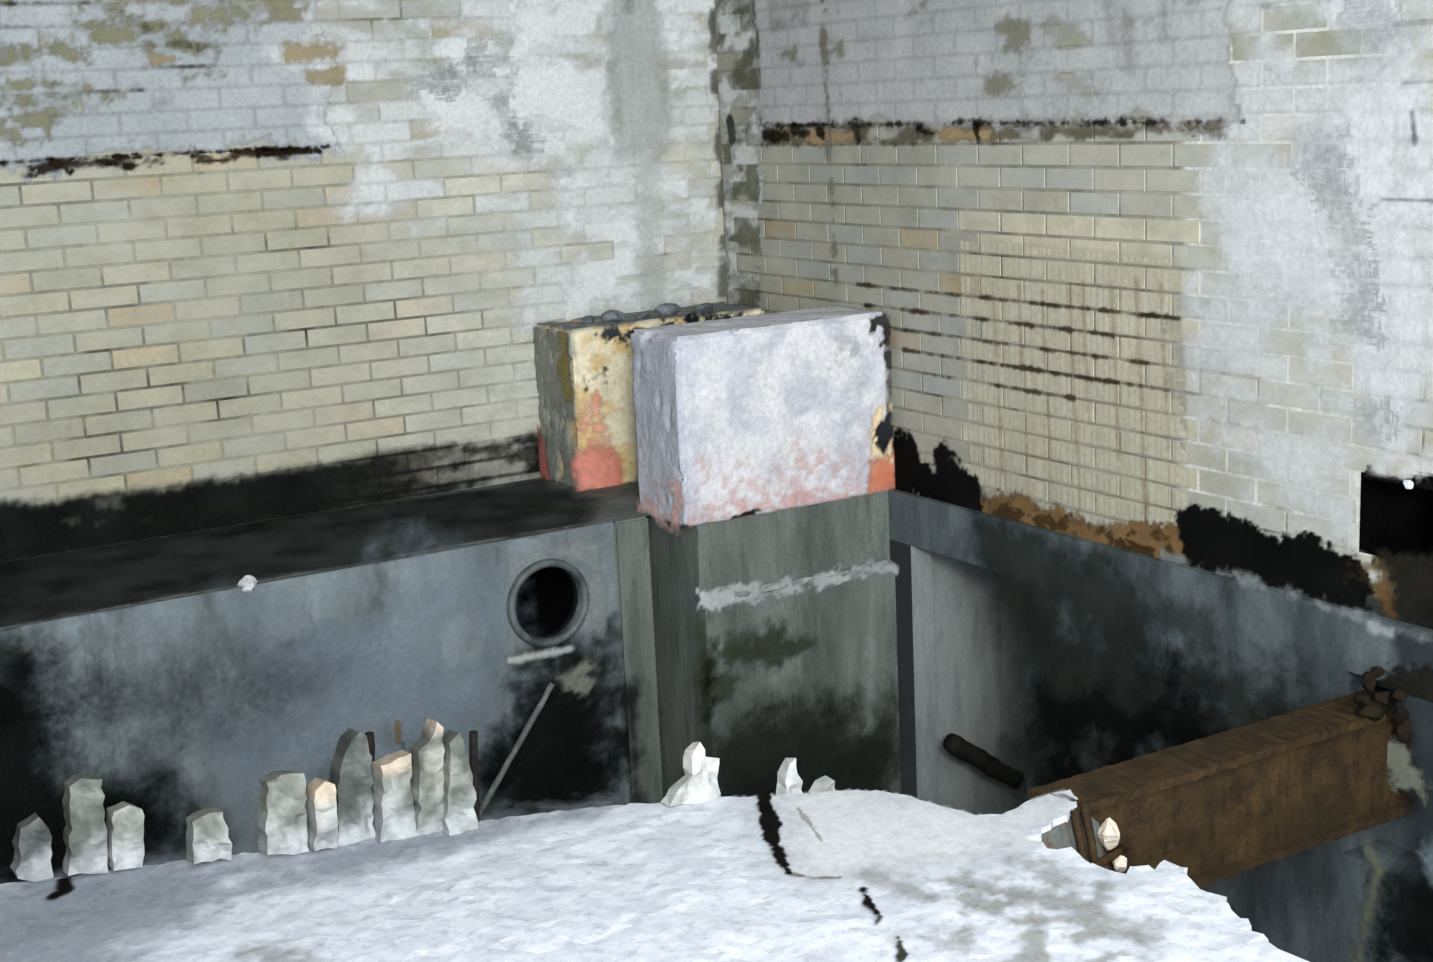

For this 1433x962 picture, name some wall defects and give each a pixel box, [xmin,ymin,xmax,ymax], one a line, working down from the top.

peeling [0,0,345,181]
damp [263,0,728,332]
damp [1186,0,1433,483]
peeling [638,479,684,529]
spalling [733,491,815,518]
spalling [836,313,1433,722]
damp [1217,419,1353,537]
damp [0,433,639,962]
damp [694,601,901,797]
crack [756,789,908,962]
spalling [1200,737,1433,962]